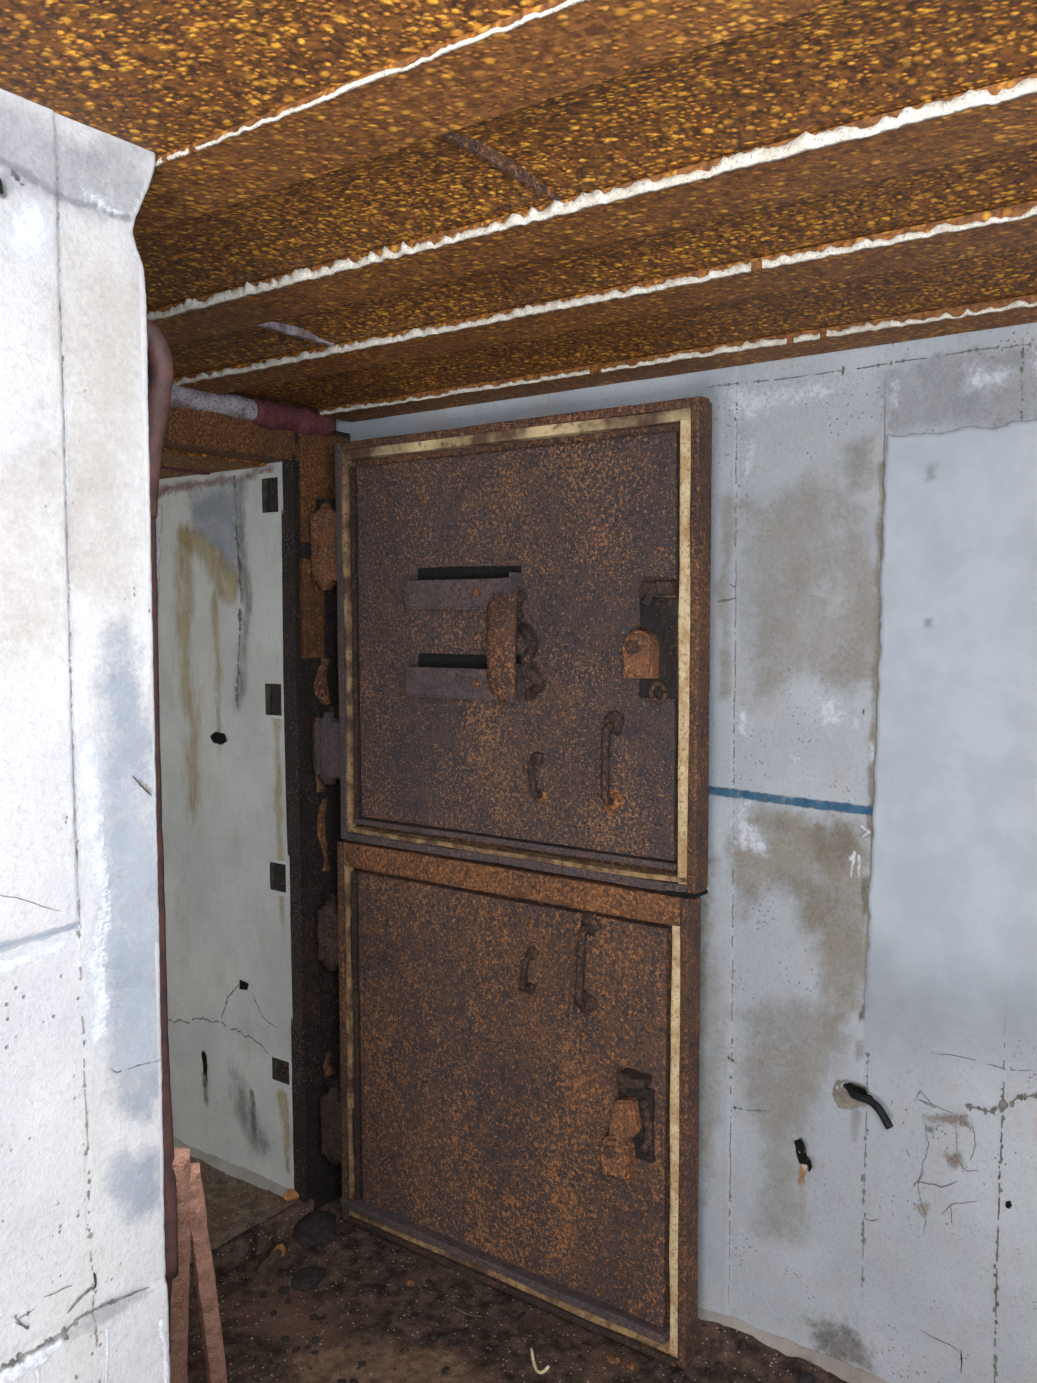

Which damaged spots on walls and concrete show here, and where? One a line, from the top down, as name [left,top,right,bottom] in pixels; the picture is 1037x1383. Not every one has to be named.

crack [0,895,61,912]
leakage [733,799,871,1009]
crack [168,984,271,1053]
crack [906,1052,1037,1228]
leakage [0,1338,64,1383]